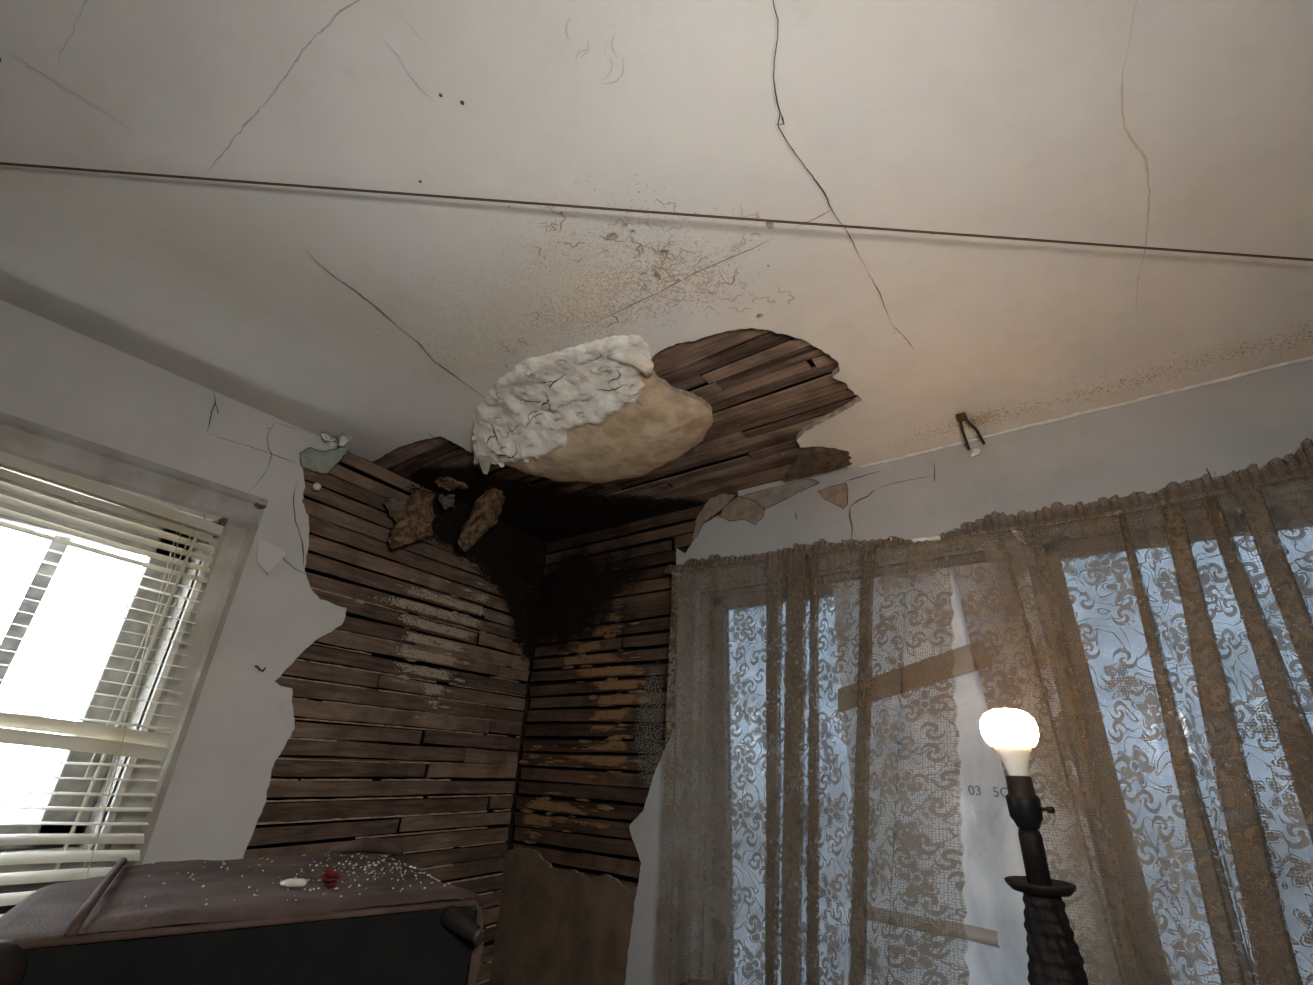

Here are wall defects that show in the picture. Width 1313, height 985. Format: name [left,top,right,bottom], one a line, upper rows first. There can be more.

crack [185,0,431,181]
crack [582,0,912,347]
crack [1121,1,1151,316]
crack [305,251,485,399]
water stain [387,184,753,394]
water stain [865,320,1313,452]
flaking render [243,199,857,985]